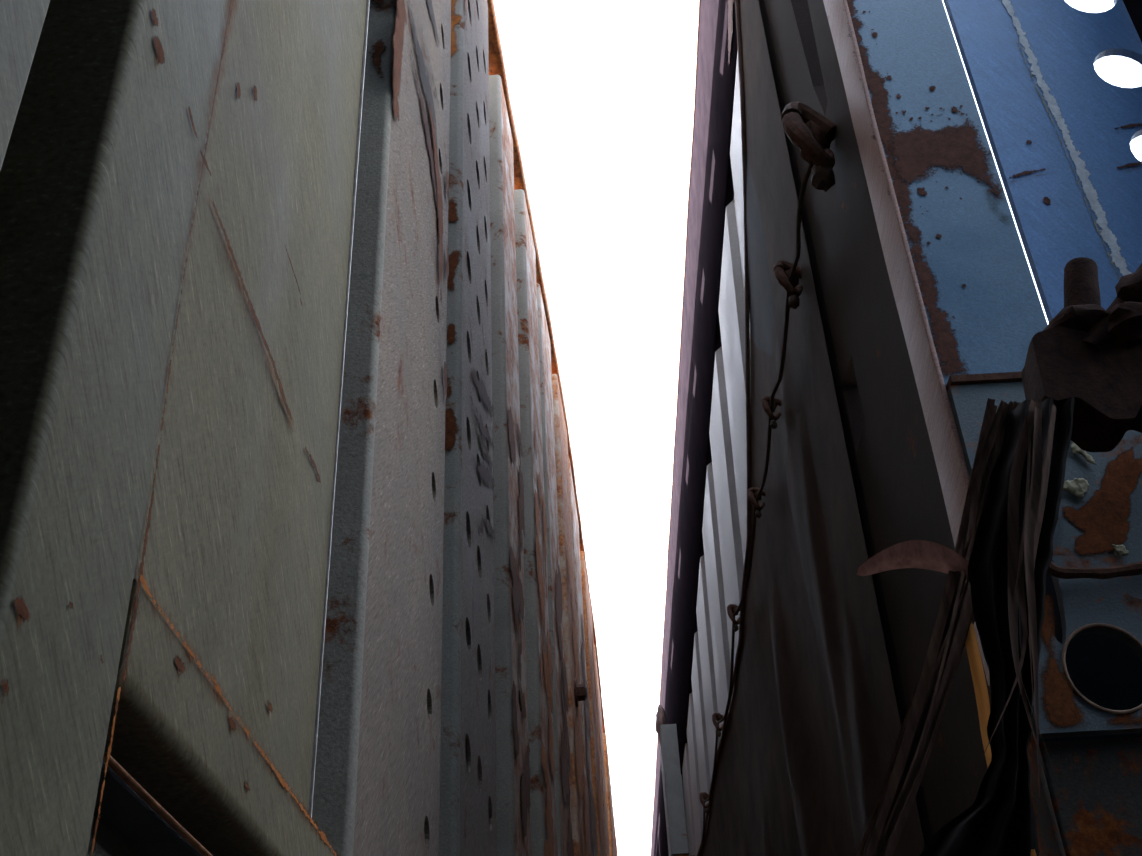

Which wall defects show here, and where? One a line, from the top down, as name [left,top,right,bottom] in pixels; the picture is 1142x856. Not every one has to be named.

corrosion [152,9,165,65]
corrosion [372,0,407,121]
corrosion [847,0,1004,376]
corrosion [447,324,456,344]
corrosion [444,362,459,451]
corrosion [91,444,337,856]
corrosion [1041,594,1084,727]